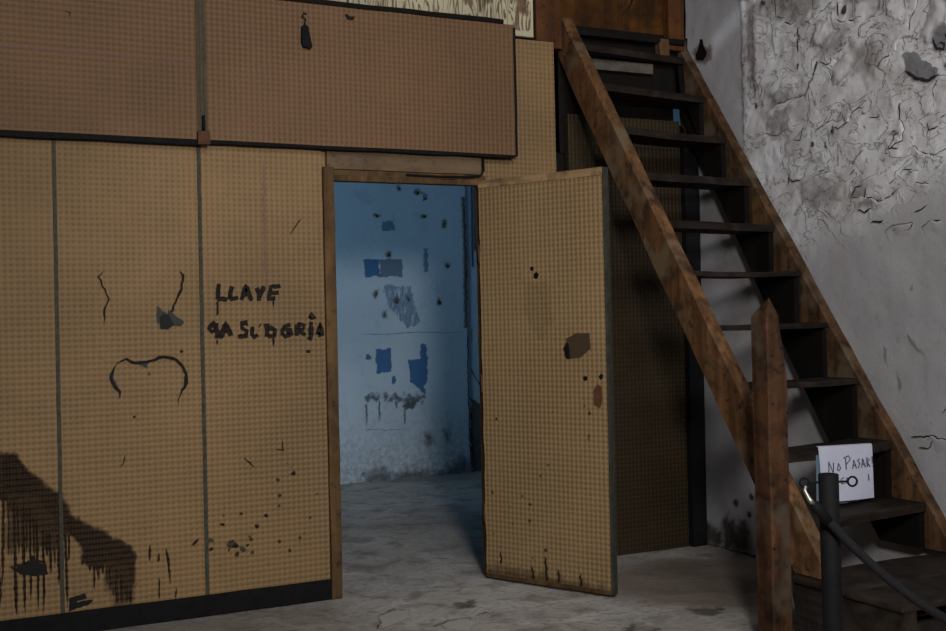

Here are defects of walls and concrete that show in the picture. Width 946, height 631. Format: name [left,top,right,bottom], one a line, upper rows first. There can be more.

spalling [886,22,946,82]
crack [765,0,946,243]
damp [365,393,425,421]
crack [912,435,946,453]
damp [0,453,136,613]
damp [148,545,177,599]